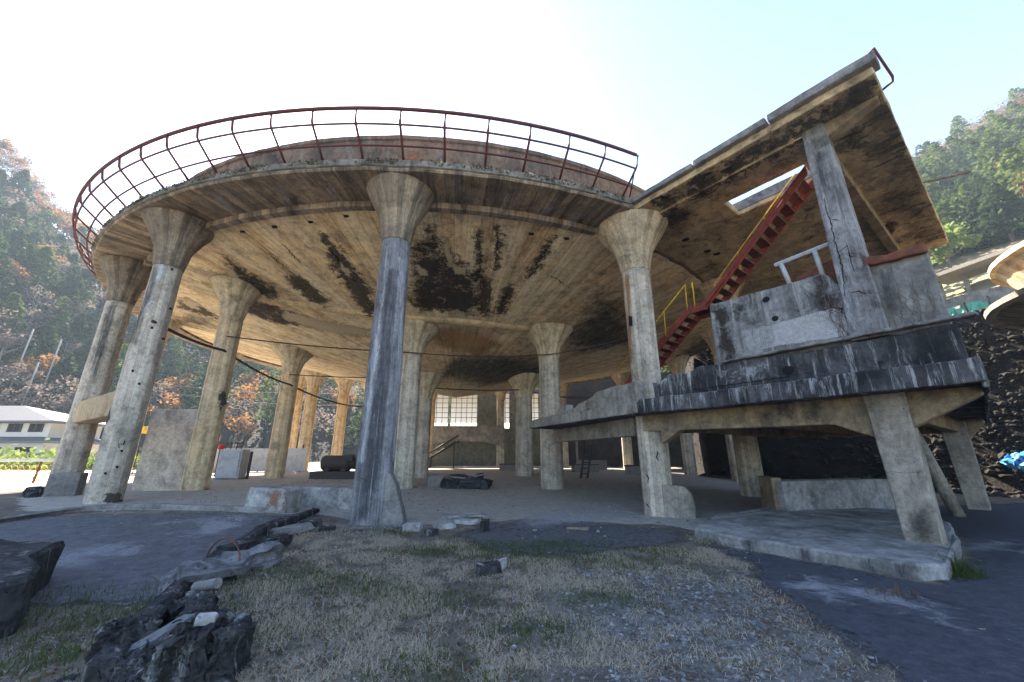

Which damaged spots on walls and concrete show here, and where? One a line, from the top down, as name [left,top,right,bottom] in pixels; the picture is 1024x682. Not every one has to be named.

water stain [317,230,363,284]
water stain [470,192,584,317]
water stain [663,207,693,229]
crack [824,199,866,295]
water stain [837,105,946,242]